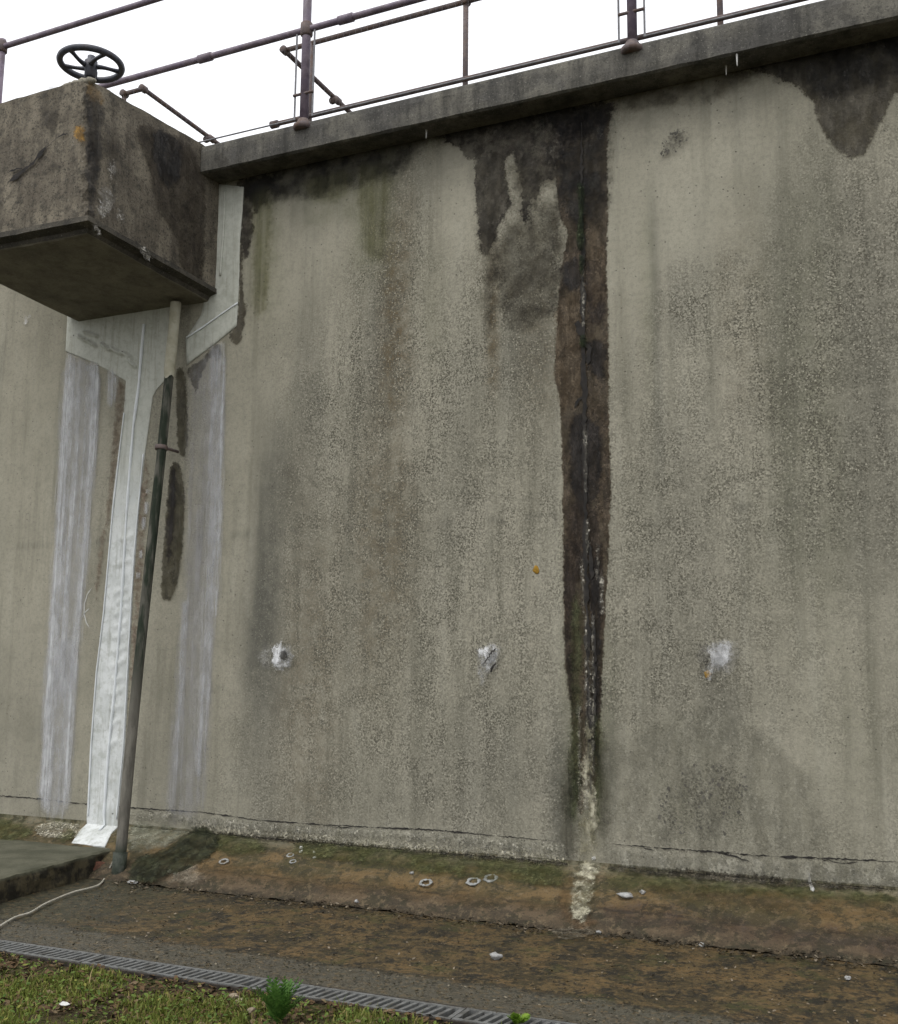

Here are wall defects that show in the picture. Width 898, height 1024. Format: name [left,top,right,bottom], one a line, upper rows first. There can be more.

water stain [139,124,206,280]
water stain [160,36,898,939]
spalling [272,642,293,670]
spalling [478,645,498,684]
spalling [697,641,731,680]
crack [606,843,895,864]